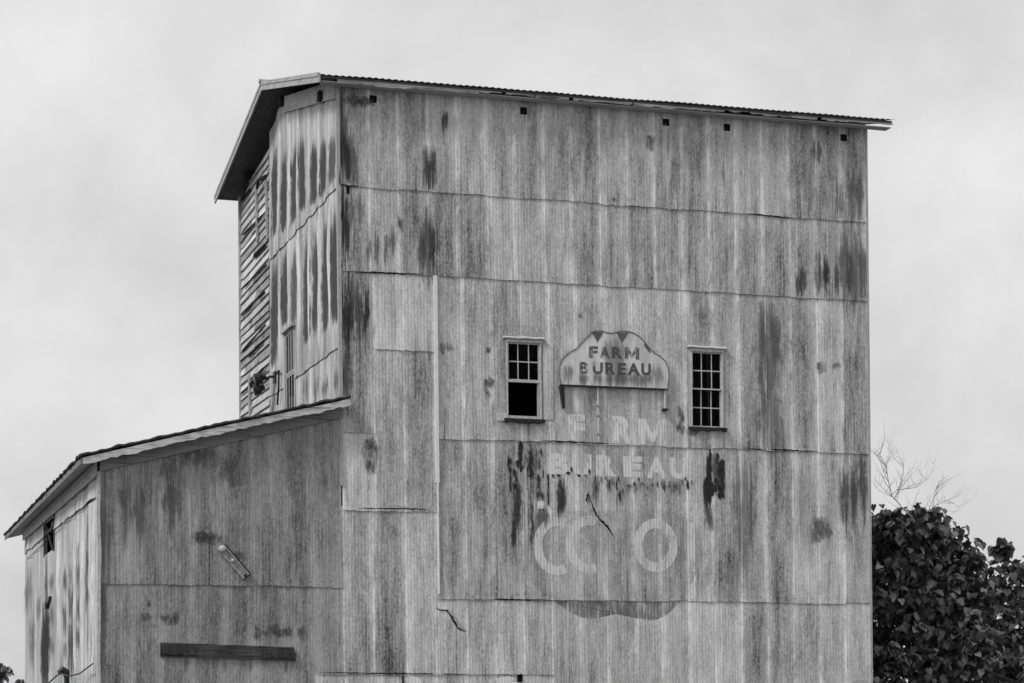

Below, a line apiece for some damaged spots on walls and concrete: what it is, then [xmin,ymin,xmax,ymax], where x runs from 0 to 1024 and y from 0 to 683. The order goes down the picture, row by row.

rust [423,146,437,190]
rust [269,88,370,417]
rust [702,445,725,533]
crack [586,493,618,558]
crack [437,603,467,654]